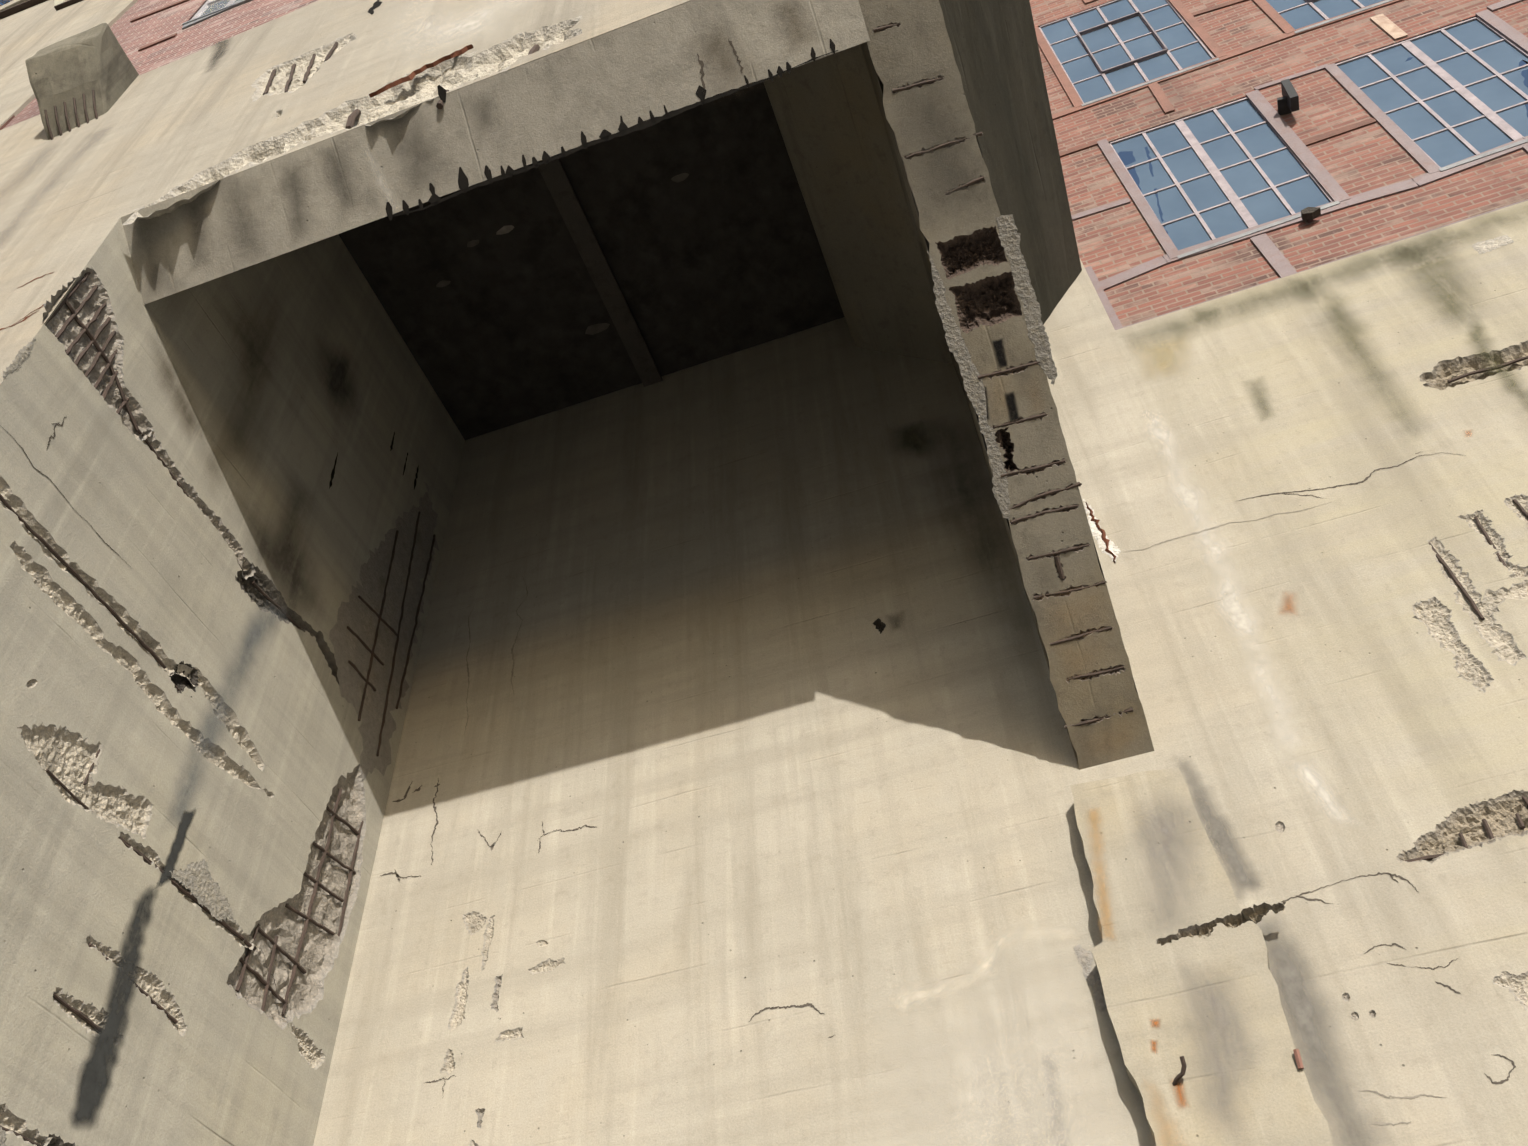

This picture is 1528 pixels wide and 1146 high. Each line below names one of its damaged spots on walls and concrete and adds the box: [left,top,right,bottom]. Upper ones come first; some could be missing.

spalling [1419,340,1528,390]
spalling [927,214,1121,602]
crack [1123,452,1466,552]
spalling [1504,493,1528,529]
spalling [1412,509,1528,693]
spalling [0,266,439,1070]
spalling [1396,789,1528,864]
crack [749,1003,834,1038]
spalling [1493,971,1528,1011]
spalling [0,1103,75,1146]